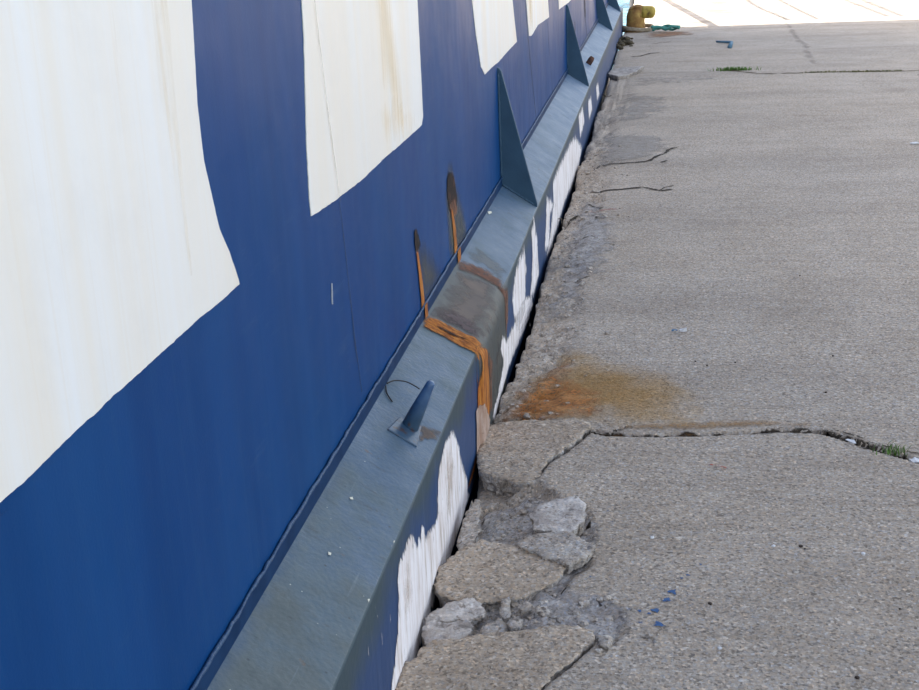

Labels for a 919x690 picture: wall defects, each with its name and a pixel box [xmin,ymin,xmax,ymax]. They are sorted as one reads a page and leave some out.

crack [558,148,674,245]
spalling [543,202,612,323]
corrosion [514,376,597,421]
crack [568,429,722,452]
crack [754,427,919,464]
spalling [480,498,543,545]
spalling [579,519,597,544]
spalling [475,564,628,638]